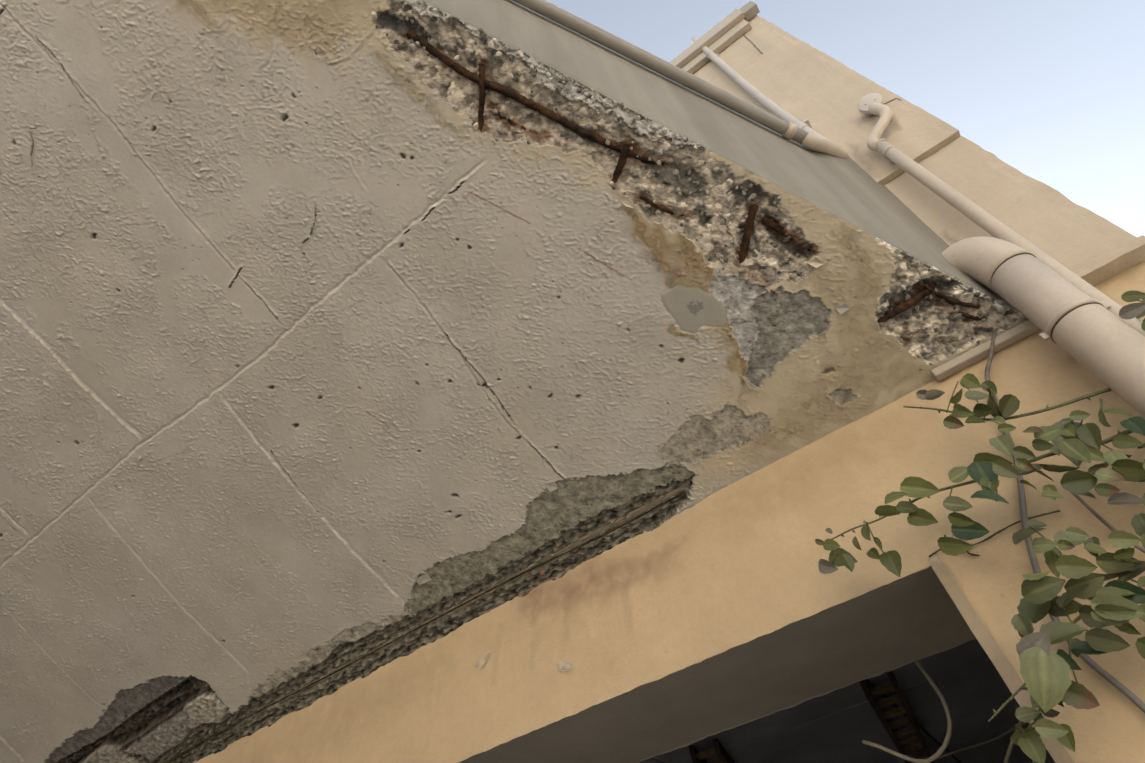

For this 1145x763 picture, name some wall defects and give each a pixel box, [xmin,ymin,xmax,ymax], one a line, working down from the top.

crack [35,37,84,98]
crack [28,128,38,167]
crack [299,205,317,256]
crack [403,182,463,234]
spalling [371,0,850,390]
rust [633,214,716,281]
crack [228,268,278,320]
spalling [873,237,1027,365]
crack [443,332,564,479]
crack [269,450,320,514]
peeling [247,402,771,701]
spalling [44,675,240,763]